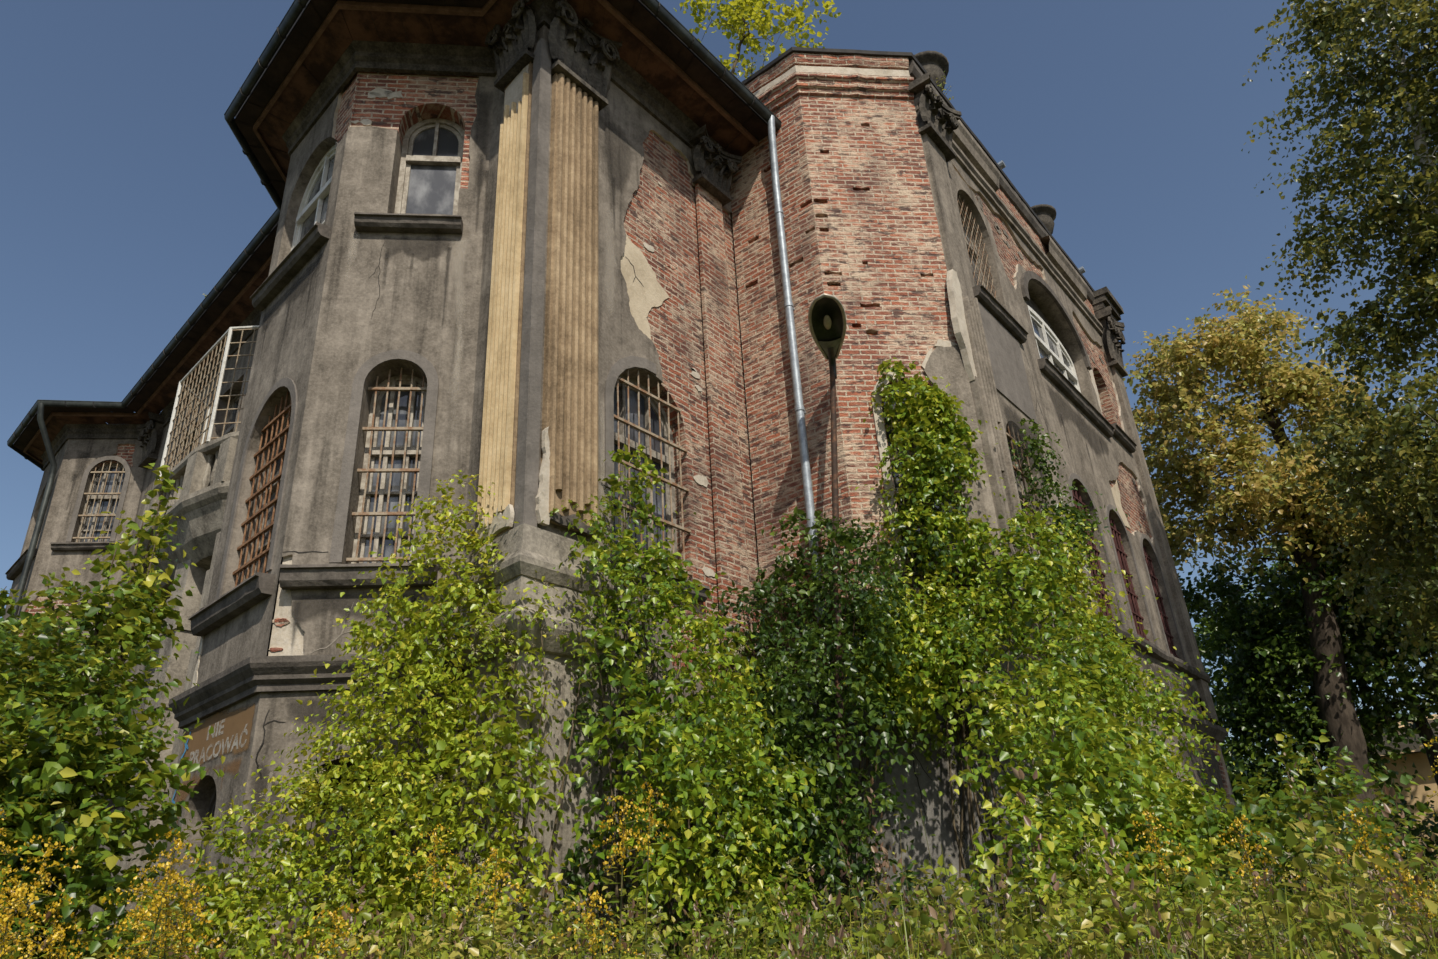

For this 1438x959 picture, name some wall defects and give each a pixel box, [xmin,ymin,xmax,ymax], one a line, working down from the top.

peeling [367,88,403,100]
peeling [690,368,702,392]